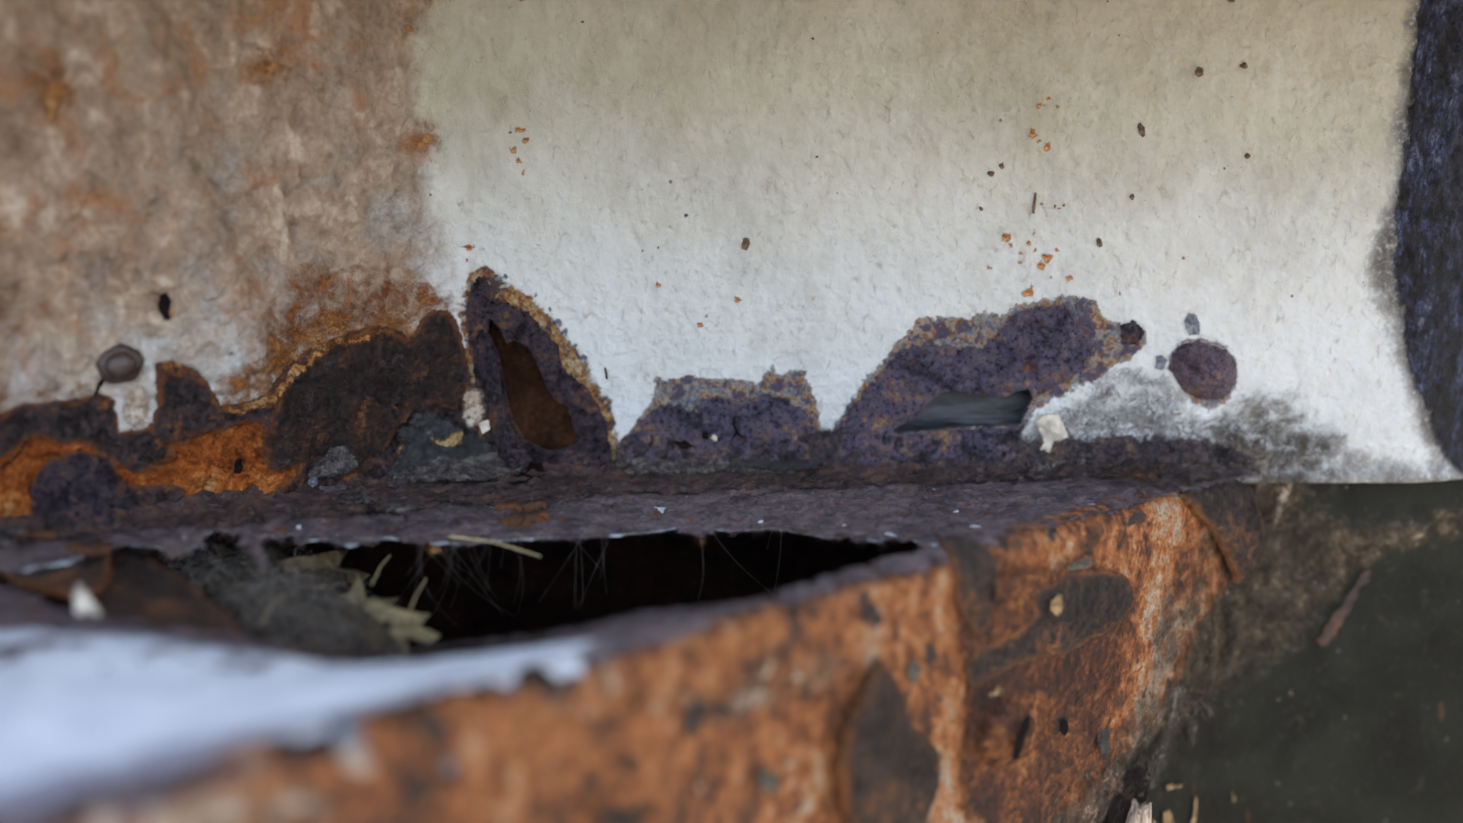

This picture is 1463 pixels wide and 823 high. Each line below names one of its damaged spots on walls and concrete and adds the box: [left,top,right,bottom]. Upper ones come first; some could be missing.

corrosion [410,122,437,152]
corrosion [0,232,1265,823]
peeling [73,583,100,617]